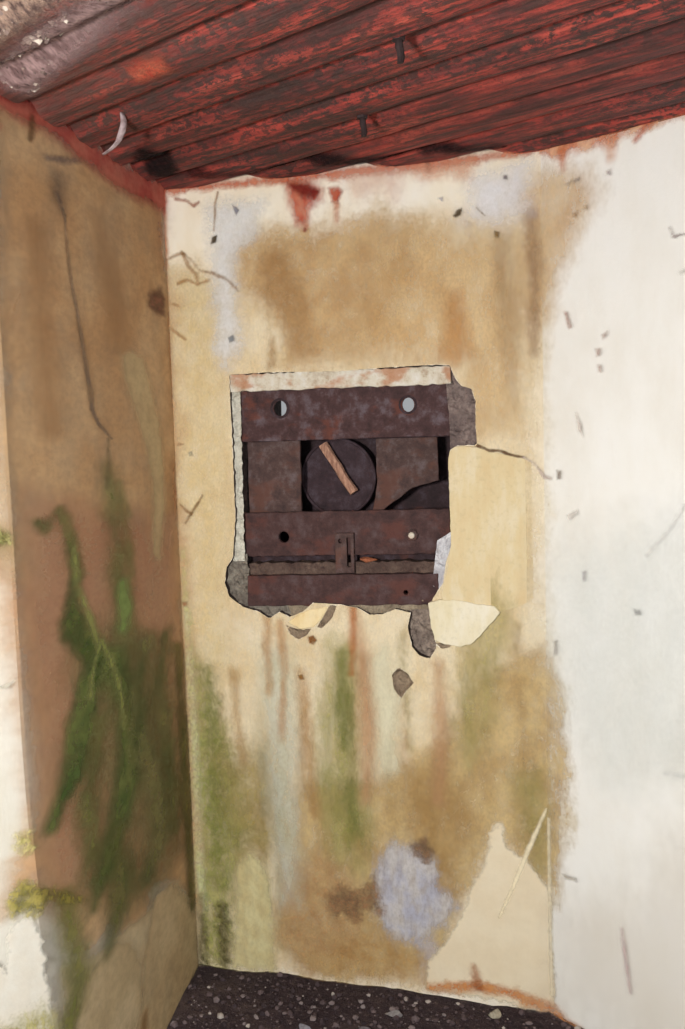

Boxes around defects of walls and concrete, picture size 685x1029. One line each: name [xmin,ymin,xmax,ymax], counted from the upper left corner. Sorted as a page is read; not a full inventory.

corrosion [133,59,169,81]
corrosion [0,95,658,254]
crack [57,193,111,438]
crack [476,444,548,478]
water stain [0,106,583,982]
flaking render [349,532,500,657]
peeling [0,916,52,1029]
peeling [63,884,198,1029]
peeling [329,809,556,1014]